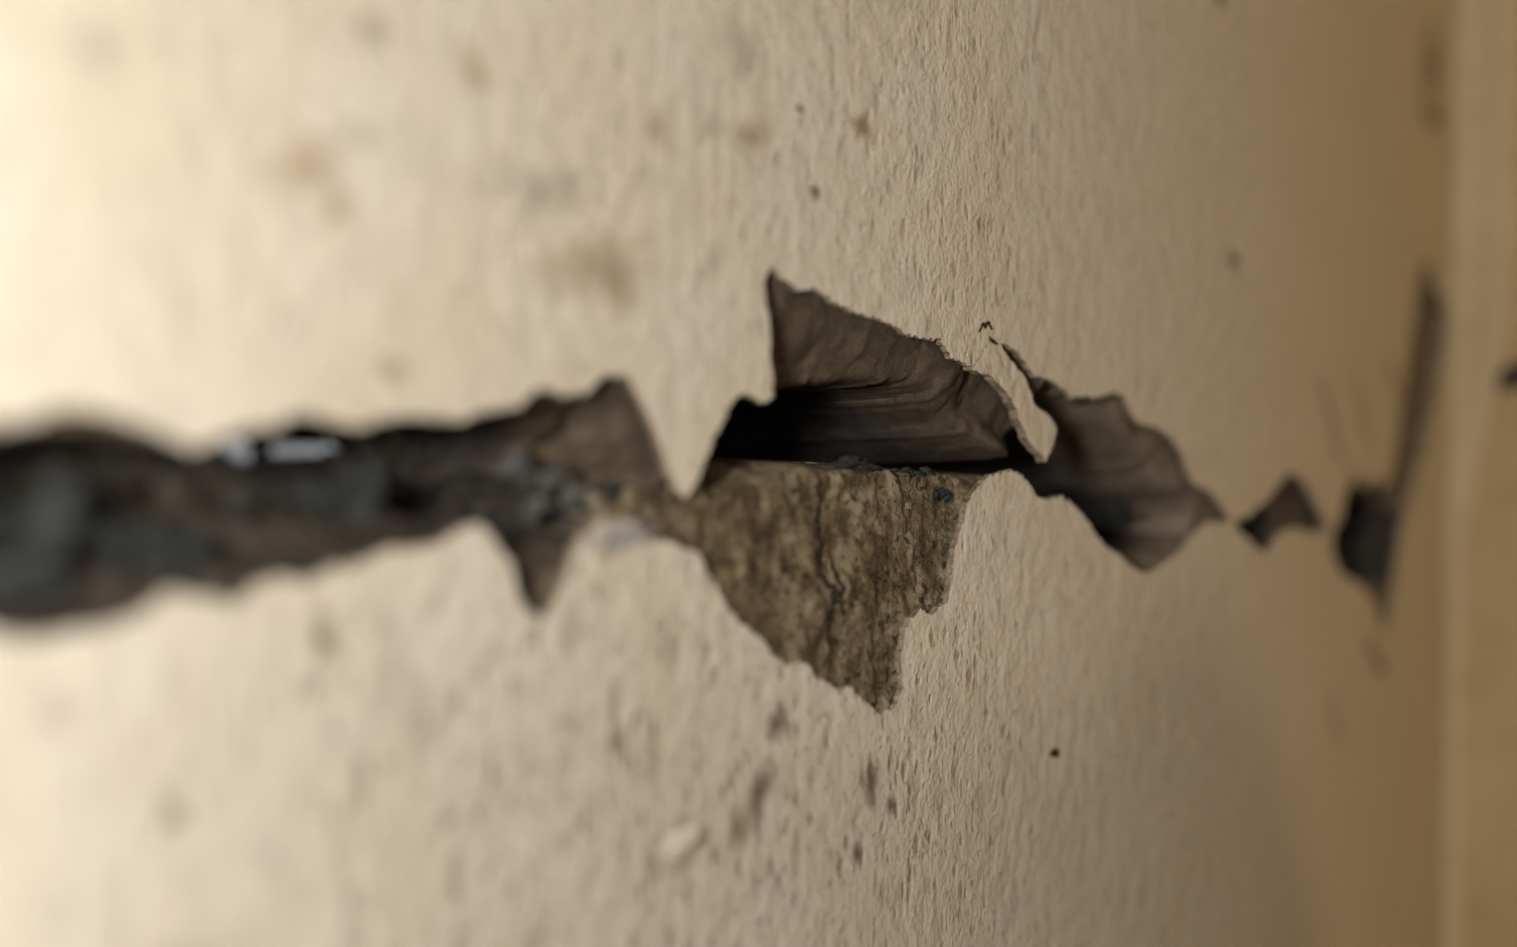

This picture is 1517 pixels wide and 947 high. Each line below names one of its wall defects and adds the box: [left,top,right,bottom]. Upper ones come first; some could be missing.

crack [0,411,590,550]
flaking render [0,271,1322,713]
crack [704,384,971,475]
crack [1317,263,1443,677]